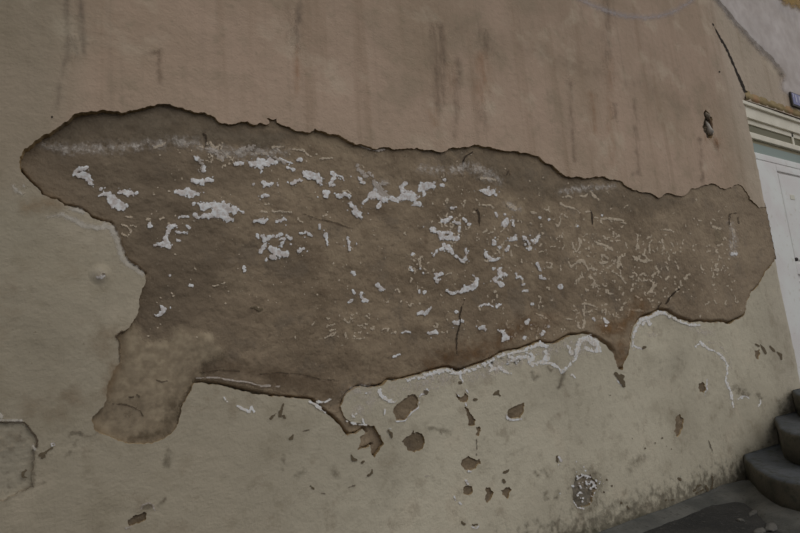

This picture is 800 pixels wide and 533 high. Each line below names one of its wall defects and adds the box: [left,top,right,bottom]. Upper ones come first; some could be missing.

crack [712,23,748,93]
flaking render [19,104,776,464]
crack [456,299,465,354]
water stain [405,334,602,385]
water stain [631,310,750,408]
flaking render [755,343,782,360]
water stain [346,388,397,426]
flaking render [571,461,604,510]